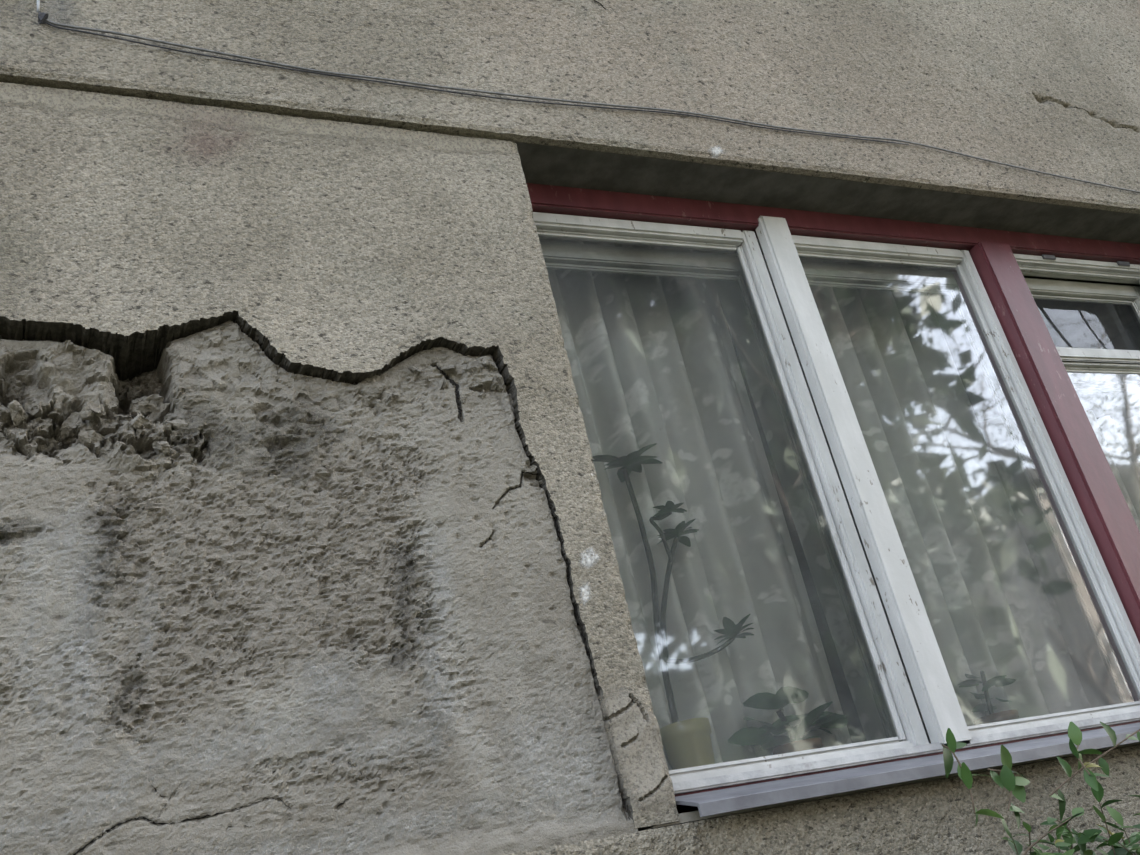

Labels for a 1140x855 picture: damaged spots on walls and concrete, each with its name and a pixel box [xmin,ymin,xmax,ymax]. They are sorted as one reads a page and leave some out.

crack [434,365,462,420]
crack [73,765,291,855]
flaking render [0,320,672,855]
crack [494,472,663,820]